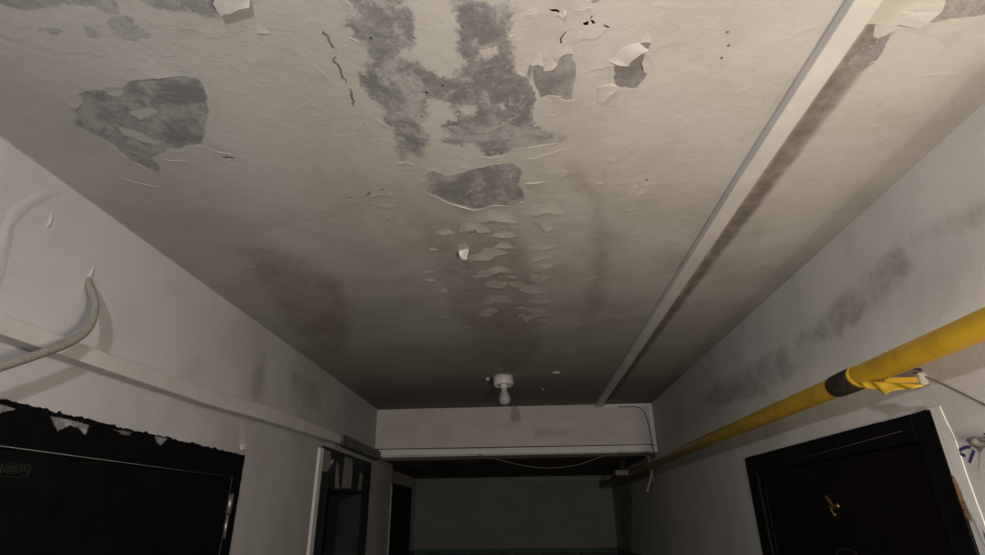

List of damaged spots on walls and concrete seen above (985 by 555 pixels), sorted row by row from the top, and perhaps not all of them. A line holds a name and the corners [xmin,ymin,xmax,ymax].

peeling [0,0,261,192]
peeling [305,0,588,217]
peeling [596,33,656,103]
peeling [848,0,985,71]
peeling [457,243,469,260]